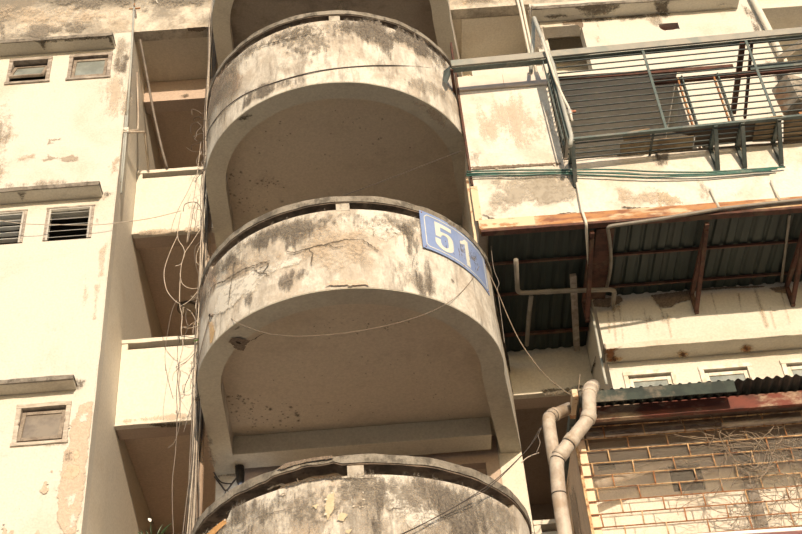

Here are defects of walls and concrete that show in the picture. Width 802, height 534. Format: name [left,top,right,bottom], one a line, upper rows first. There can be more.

leakage [524,4,566,49]
leakage [576,1,669,24]
leakage [206,19,448,147]
crack [287,239,379,266]
crack [207,260,270,305]
leakage [198,212,434,357]
spalling [651,285,786,307]
spalling [229,338,251,351]
flaking render [39,400,93,534]
flaking render [313,492,365,534]